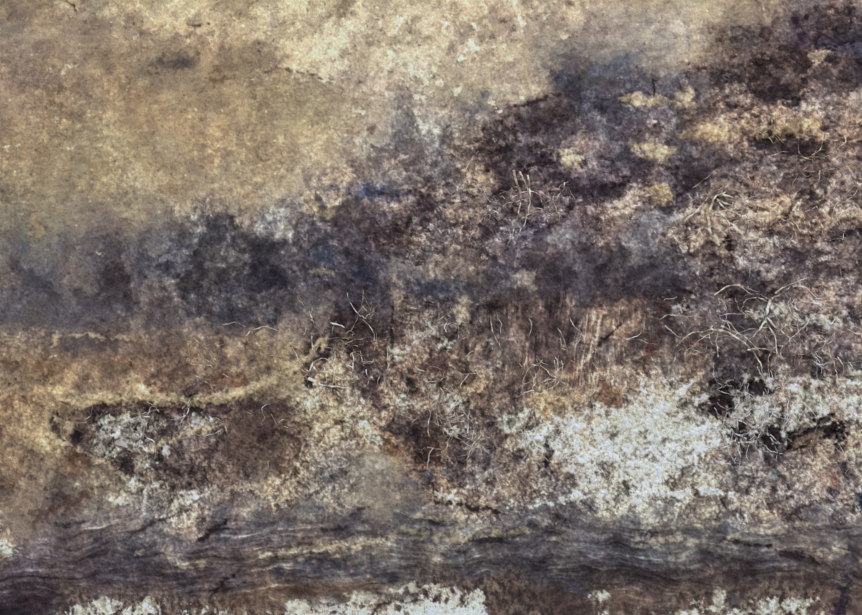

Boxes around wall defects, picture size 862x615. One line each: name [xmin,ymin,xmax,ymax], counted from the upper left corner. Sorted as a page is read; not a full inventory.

damp [146,40,290,90]
damp [518,36,714,132]
damp [0,175,862,516]